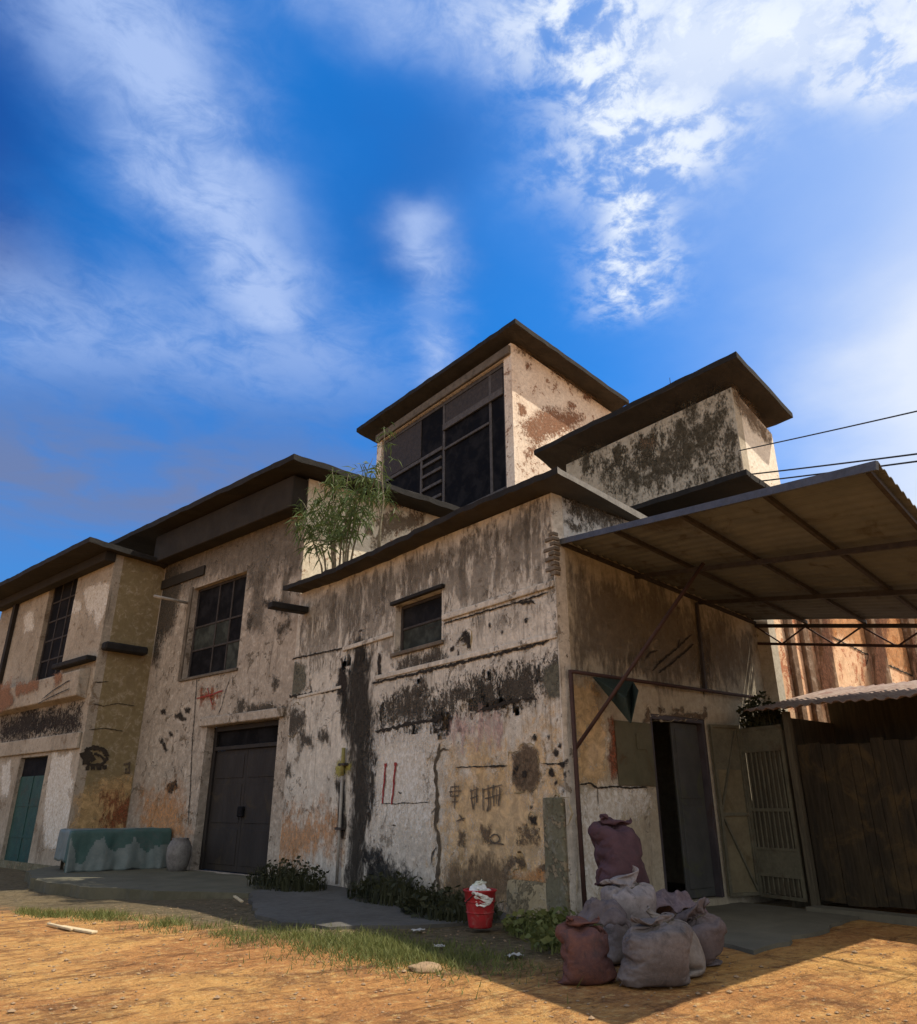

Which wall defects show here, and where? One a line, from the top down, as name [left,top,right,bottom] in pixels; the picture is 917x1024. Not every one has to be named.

peeling [518,393,593,462]
damp [573,387,772,504]
spalling [0,677,84,743]
damp [279,636,564,908]
crack [375,716,508,891]